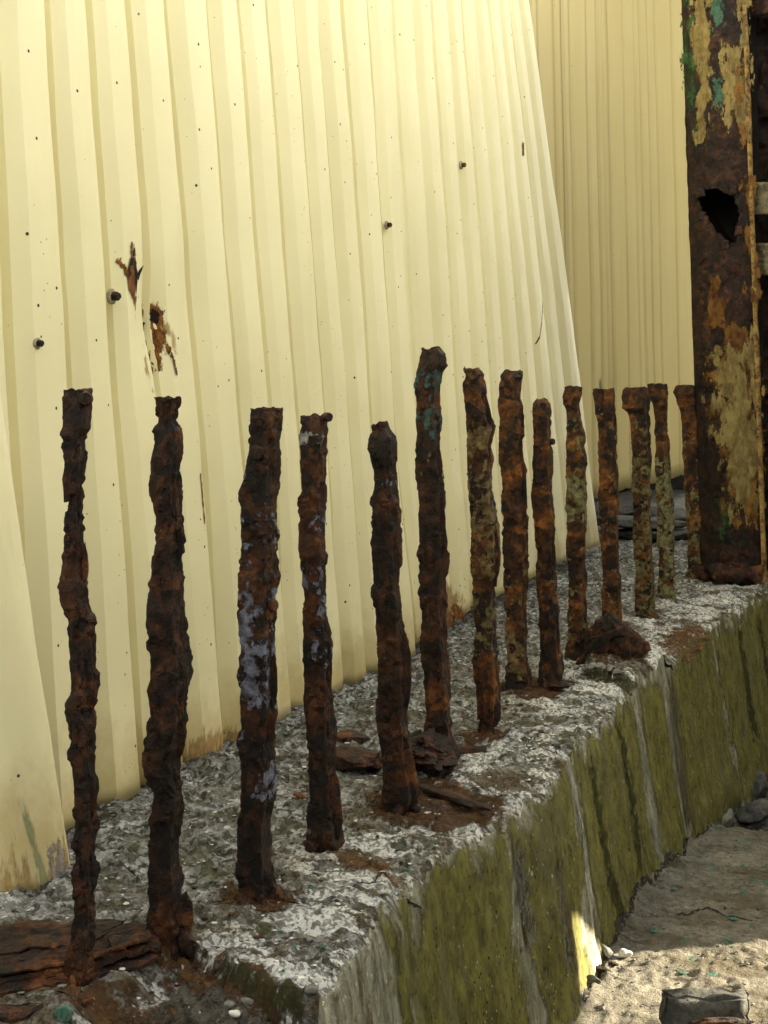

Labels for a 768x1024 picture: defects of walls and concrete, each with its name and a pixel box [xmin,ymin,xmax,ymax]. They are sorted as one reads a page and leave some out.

peeling [679,0,755,150]
corrosion [62,465,89,583]
corrosion [147,665,165,708]
corrosion [268,653,278,742]
corrosion [454,666,578,759]
leakage [739,621,760,743]
corrosion [0,891,279,1024]
corrosion [307,697,402,888]
corrosion [358,739,519,834]
leakage [551,813,580,973]
leakage [589,755,626,921]
leakage [617,715,643,874]